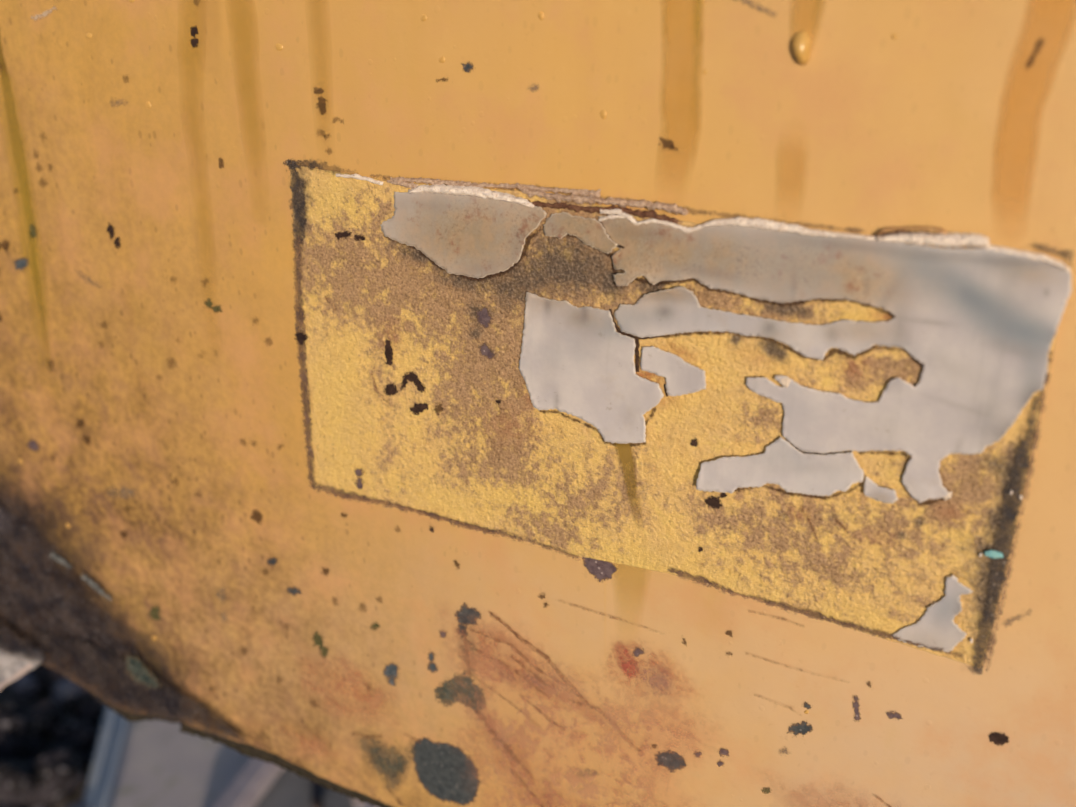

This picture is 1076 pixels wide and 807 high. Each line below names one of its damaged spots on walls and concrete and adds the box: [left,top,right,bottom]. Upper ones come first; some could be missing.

spalling [335,230,365,241]
peeling [380,192,1072,509]
spalling [355,469,364,489]
peeling [582,557,617,582]
peeling [891,575,973,652]